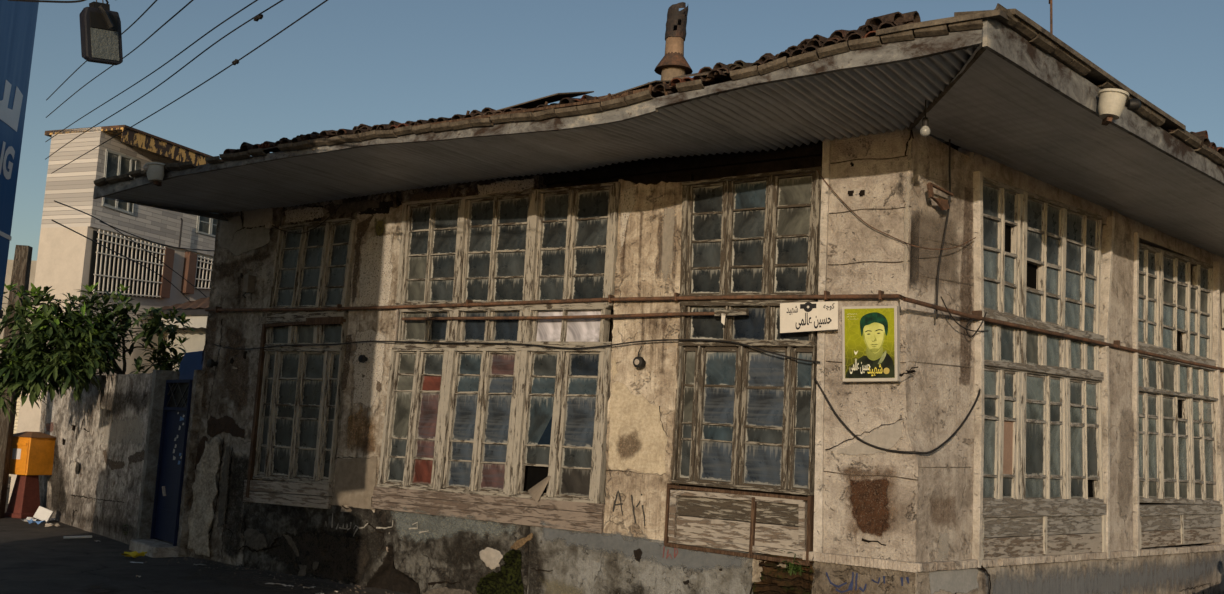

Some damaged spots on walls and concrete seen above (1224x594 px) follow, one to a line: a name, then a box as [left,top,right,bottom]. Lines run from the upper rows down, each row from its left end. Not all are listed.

flaking render [477,178,534,195]
water stain [346,376,374,453]
flaking render [187,416,245,557]
flaking render [365,545,420,594]
flaking render [475,533,533,594]
flaking render [752,554,814,594]